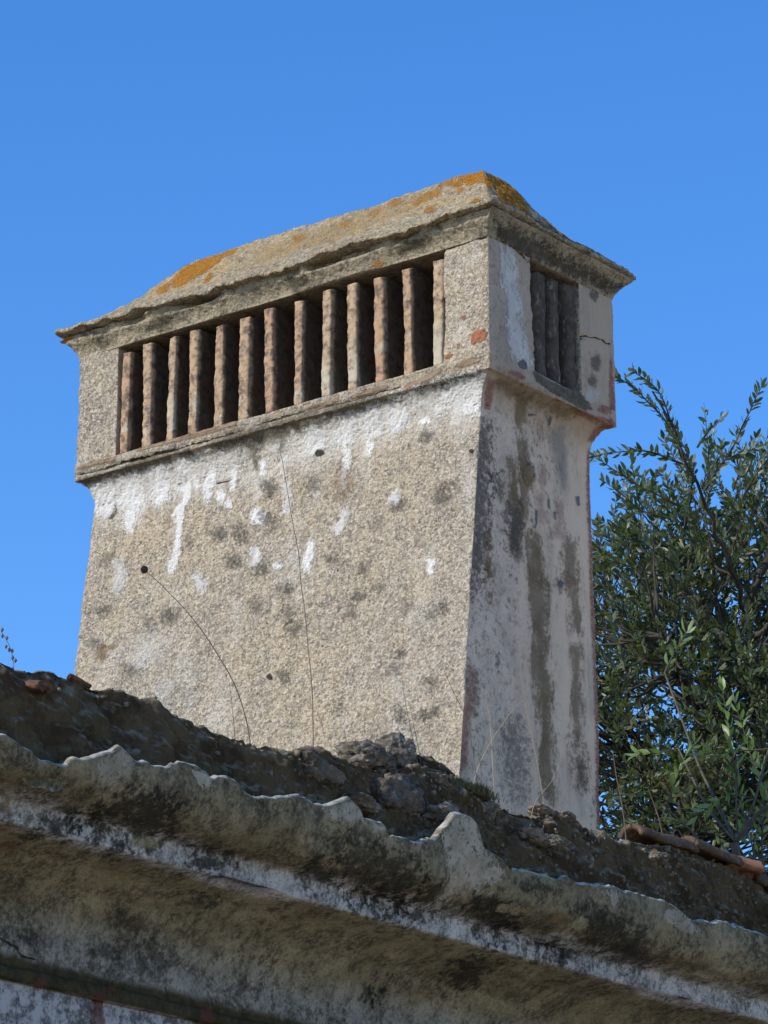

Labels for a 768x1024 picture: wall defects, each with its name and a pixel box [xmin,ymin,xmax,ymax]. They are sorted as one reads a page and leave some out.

water stain [77,370,584,807]
water stain [22,785,189,861]
water stain [179,844,240,880]